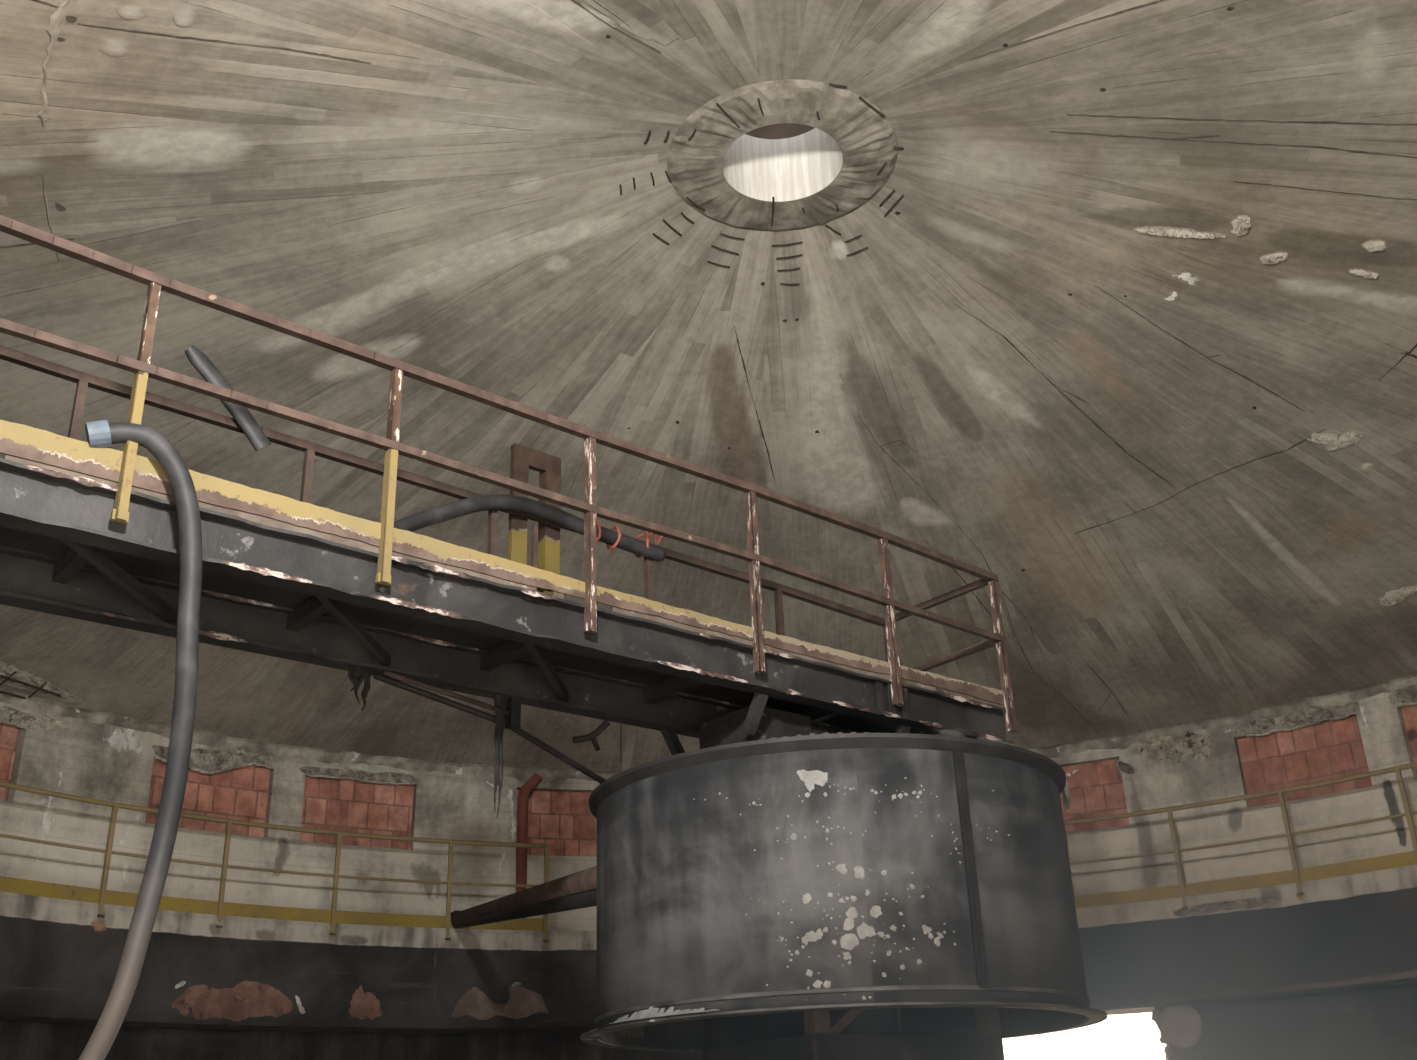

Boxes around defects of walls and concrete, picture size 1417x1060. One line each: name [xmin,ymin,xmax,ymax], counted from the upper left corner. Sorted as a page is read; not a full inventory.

damp [411,0,679,46]
crack [1051,114,1417,158]
crack [1233,181,1417,200]
spalling [1133,213,1253,239]
spalling [1259,250,1291,265]
spalling [1347,239,1389,279]
crack [1379,344,1417,380]
crack [955,285,1325,534]
peeling [199,629,245,642]
spalling [0,656,91,733]